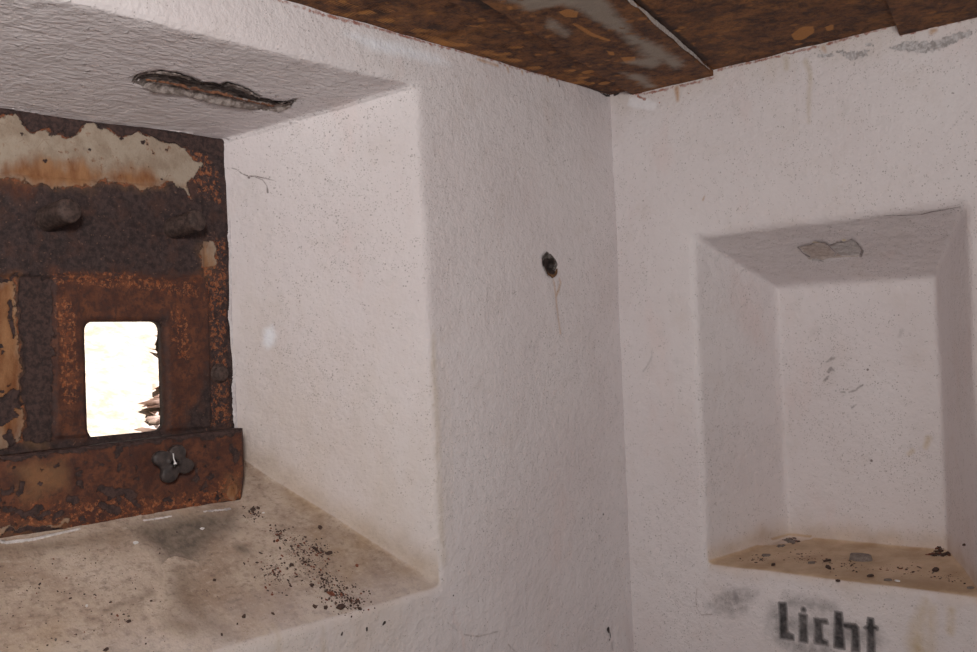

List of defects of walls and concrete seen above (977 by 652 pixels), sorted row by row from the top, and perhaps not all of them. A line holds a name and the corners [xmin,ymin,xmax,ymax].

spalling [131,70,299,113]
leakage [0,504,253,648]